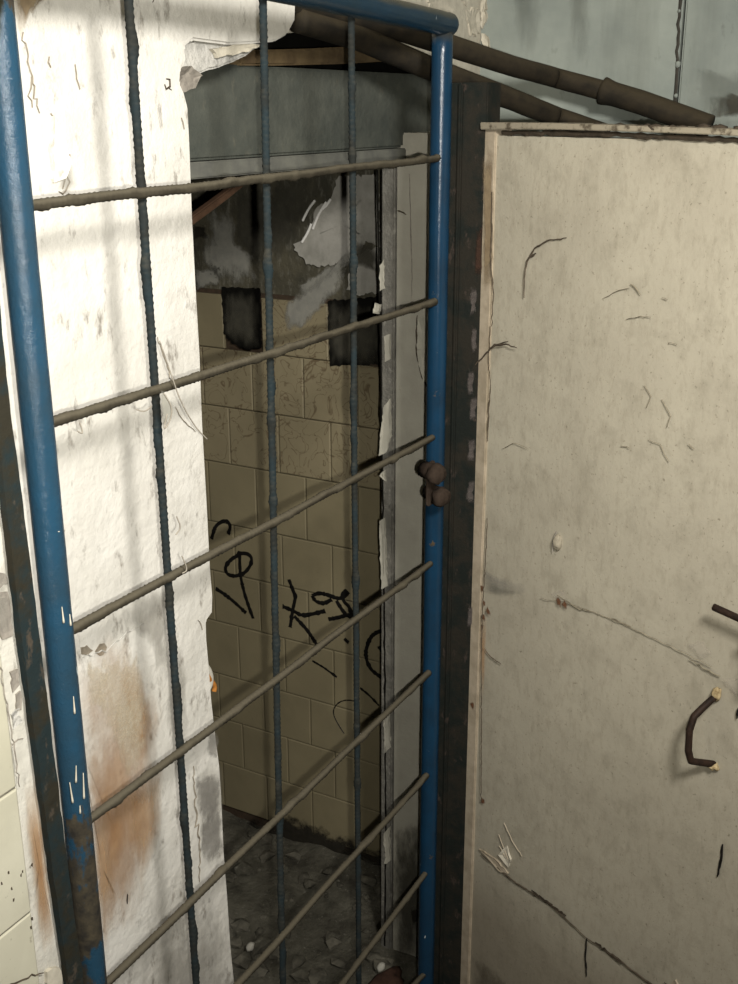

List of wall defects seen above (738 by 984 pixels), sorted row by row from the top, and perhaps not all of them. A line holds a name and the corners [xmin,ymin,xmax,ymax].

spalling [164,42,260,92]
water stain [719,94,738,116]
peeling [194,174,391,367]
peeling [379,399,392,456]
peeling [379,518,388,589]
peeling [383,714,391,753]
corrosion [98,748,155,901]
peeling [383,826,391,864]
crack [479,849,679,984]